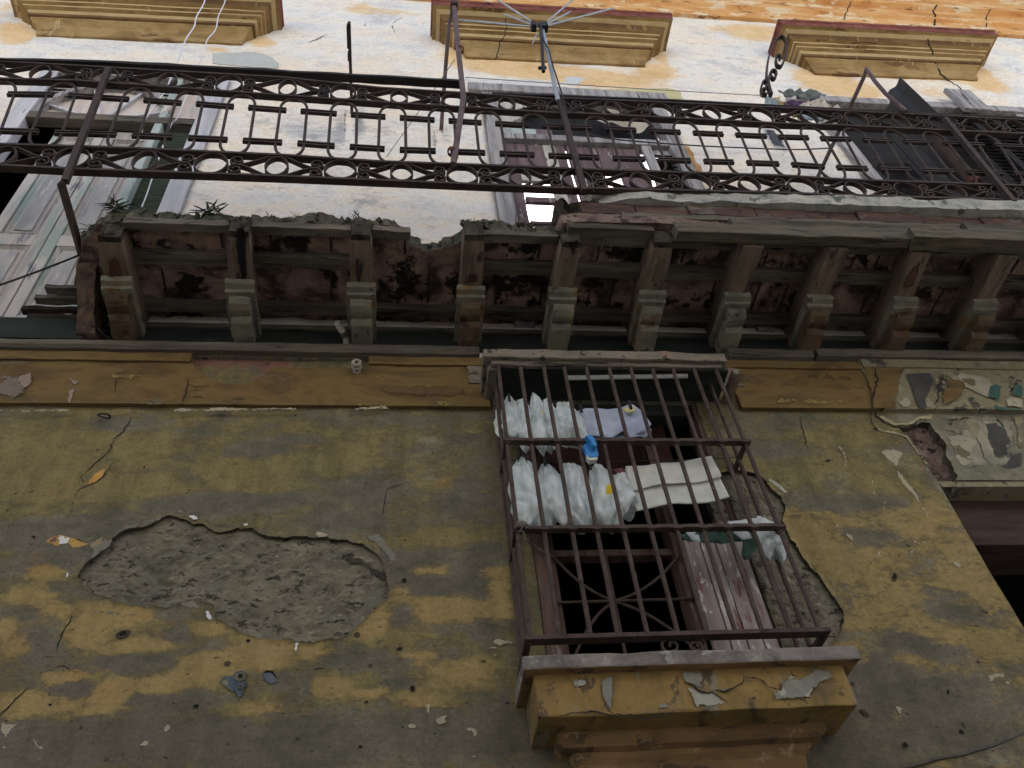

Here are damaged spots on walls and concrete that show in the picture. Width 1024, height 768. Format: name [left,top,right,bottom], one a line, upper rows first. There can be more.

crack [927,5,963,90]
peeling [0,373,32,398]
peeling [22,376,79,412]
crack [75,417,131,496]
crack [869,367,991,464]
flaking render [873,372,1023,522]
flaking render [30,509,396,651]
flaking render [709,473,843,648]
peeling [682,672,727,707]
peeling [774,669,831,700]